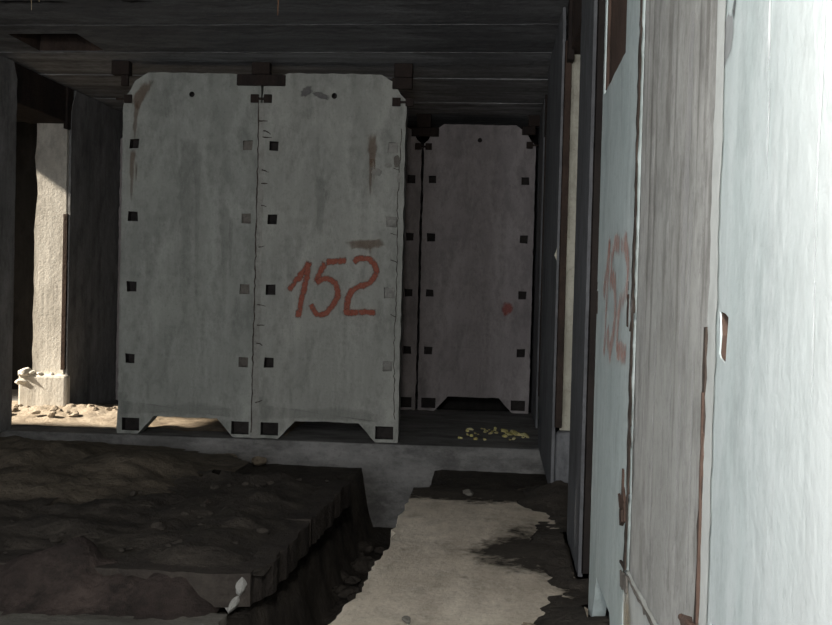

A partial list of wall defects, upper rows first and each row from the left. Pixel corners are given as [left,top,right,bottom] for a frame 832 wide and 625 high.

spalling [619,560,628,594]